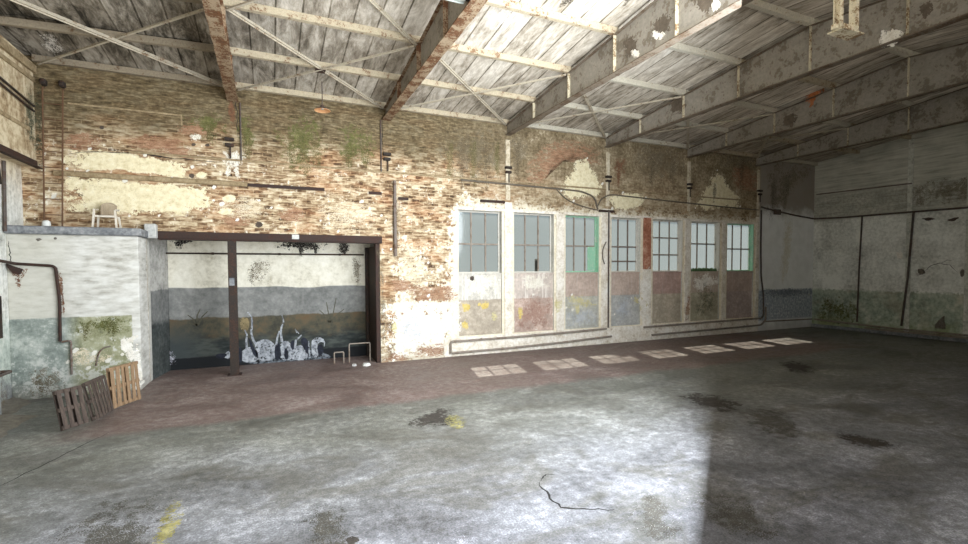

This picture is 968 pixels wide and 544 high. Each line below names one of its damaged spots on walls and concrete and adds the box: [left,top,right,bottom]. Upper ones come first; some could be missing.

peeling [51,123,306,228]
peeling [318,200,383,233]
spalling [525,140,647,210]
peeling [695,169,741,211]